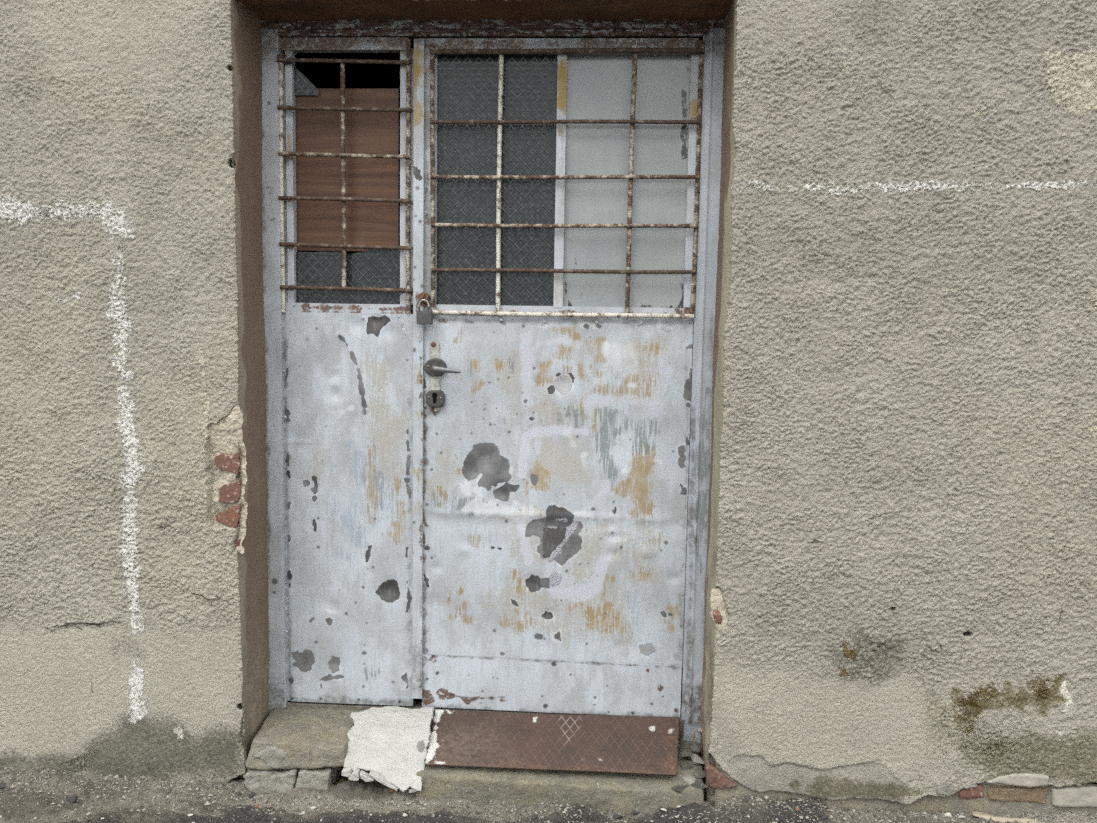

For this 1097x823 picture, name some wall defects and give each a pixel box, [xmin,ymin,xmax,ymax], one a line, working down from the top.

spalling [209,404,248,554]
flaking render [936,773,1049,796]